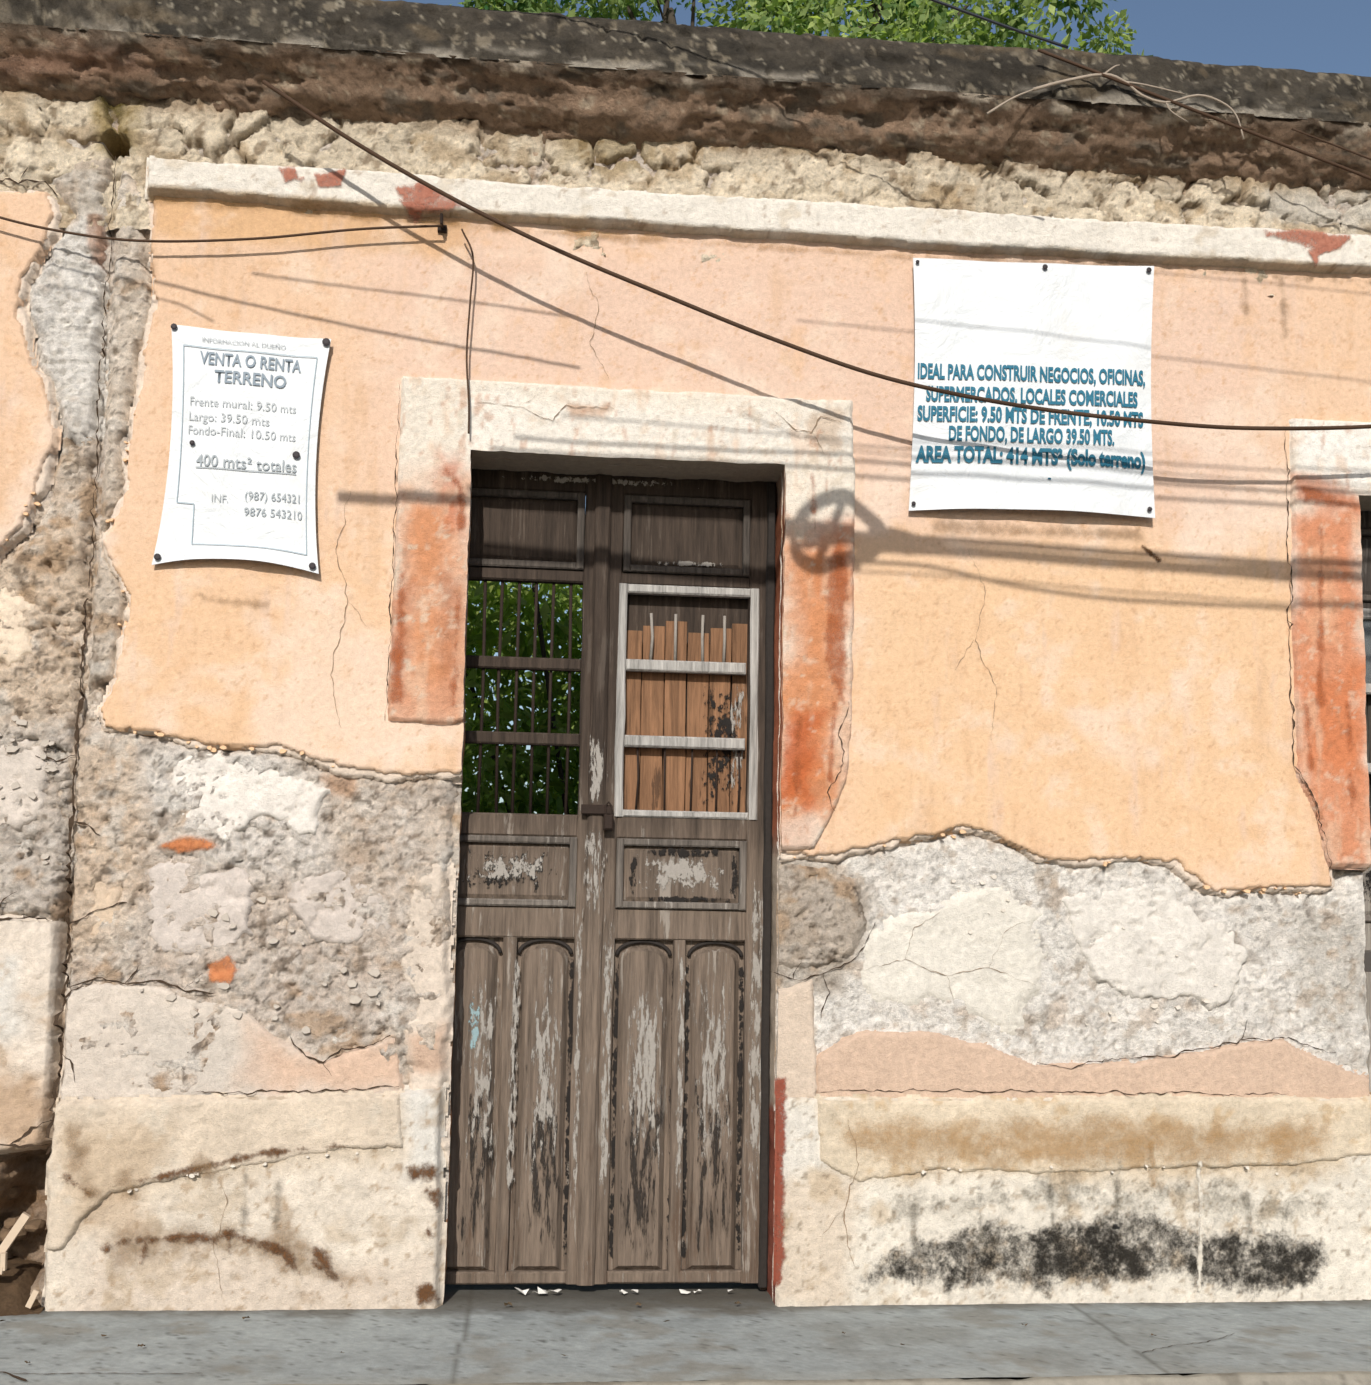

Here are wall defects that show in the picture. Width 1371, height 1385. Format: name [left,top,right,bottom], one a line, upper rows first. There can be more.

spalling [0,89,1371,1093]
spalling [453,829,1371,1285]
leakage [869,1161,1325,1293]